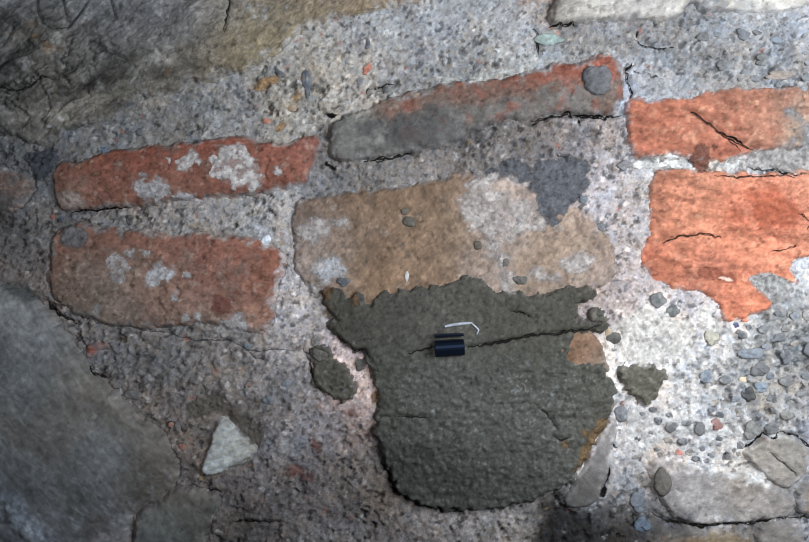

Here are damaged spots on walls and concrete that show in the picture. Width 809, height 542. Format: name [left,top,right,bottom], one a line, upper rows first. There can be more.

crack [634,31,674,50]
crack [625,63,661,99]
crack [531,111,621,126]
crack [691,112,804,179]
crack [364,153,412,163]
crack [467,310,602,348]
crack [652,512,809,529]